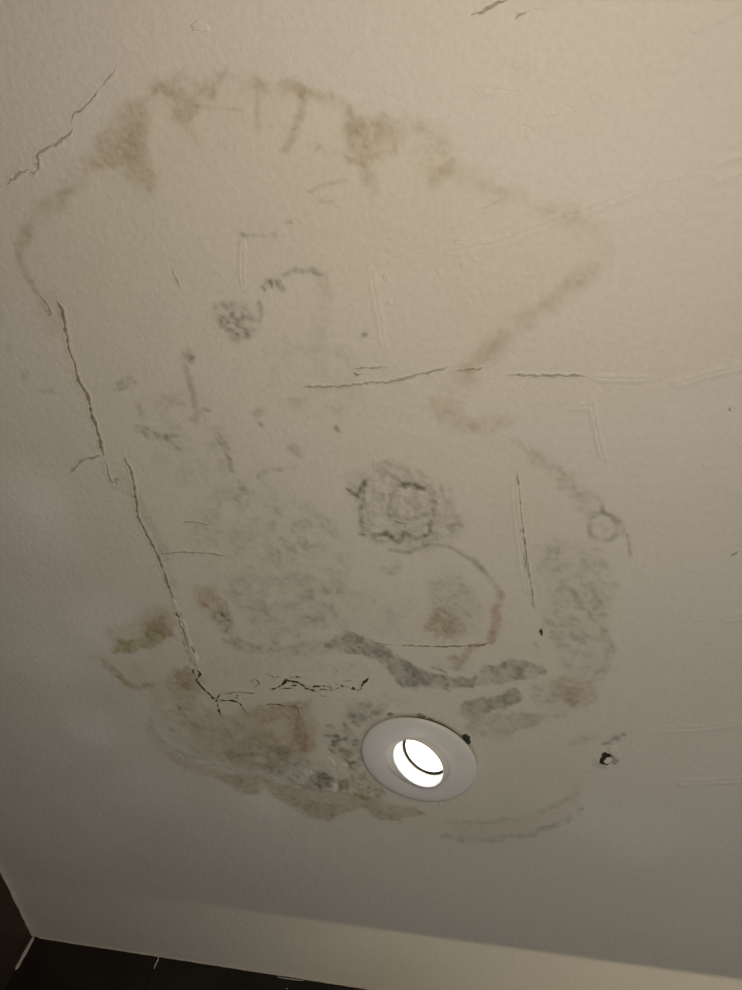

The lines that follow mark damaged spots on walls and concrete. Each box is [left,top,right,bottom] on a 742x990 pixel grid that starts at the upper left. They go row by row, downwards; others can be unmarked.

crack [5,63,118,186]
crack [38,294,370,715]